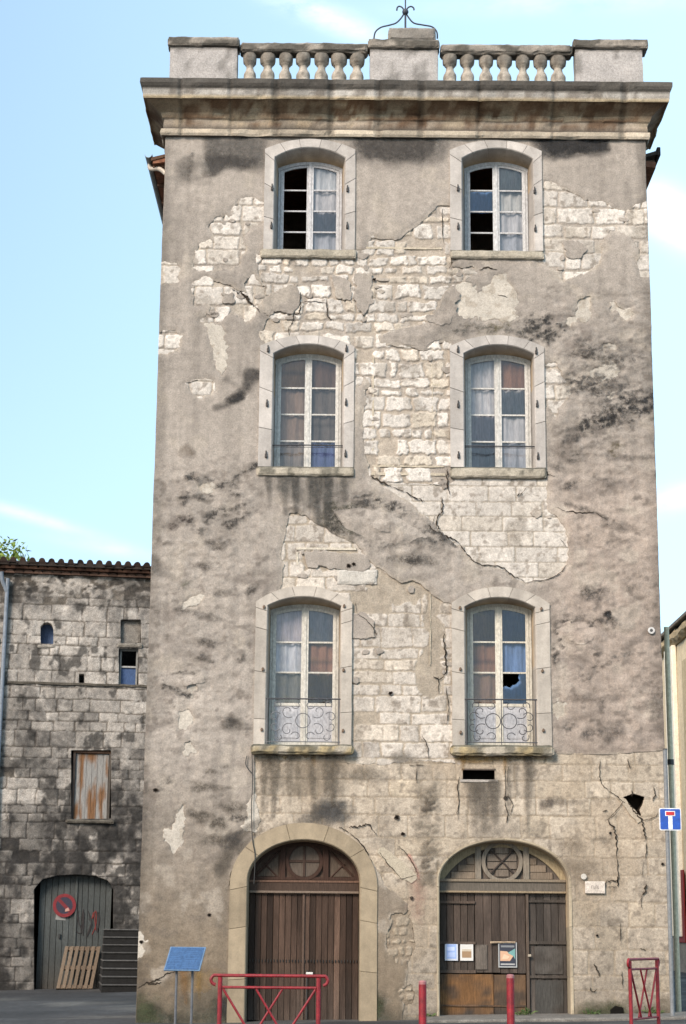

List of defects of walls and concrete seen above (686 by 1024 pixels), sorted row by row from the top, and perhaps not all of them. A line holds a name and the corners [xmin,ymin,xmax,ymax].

damp [206,137,263,175]
spalling [538,181,650,281]
damp [221,369,260,407]
spalling [158,197,572,583]
crack [371,469,568,582]
spalling [280,513,462,766]
crack [433,634,449,725]
flaking render [163,805,186,854]
damp [303,801,348,823]
crack [339,823,418,879]
crack [599,761,658,910]
spalling [623,794,644,816]